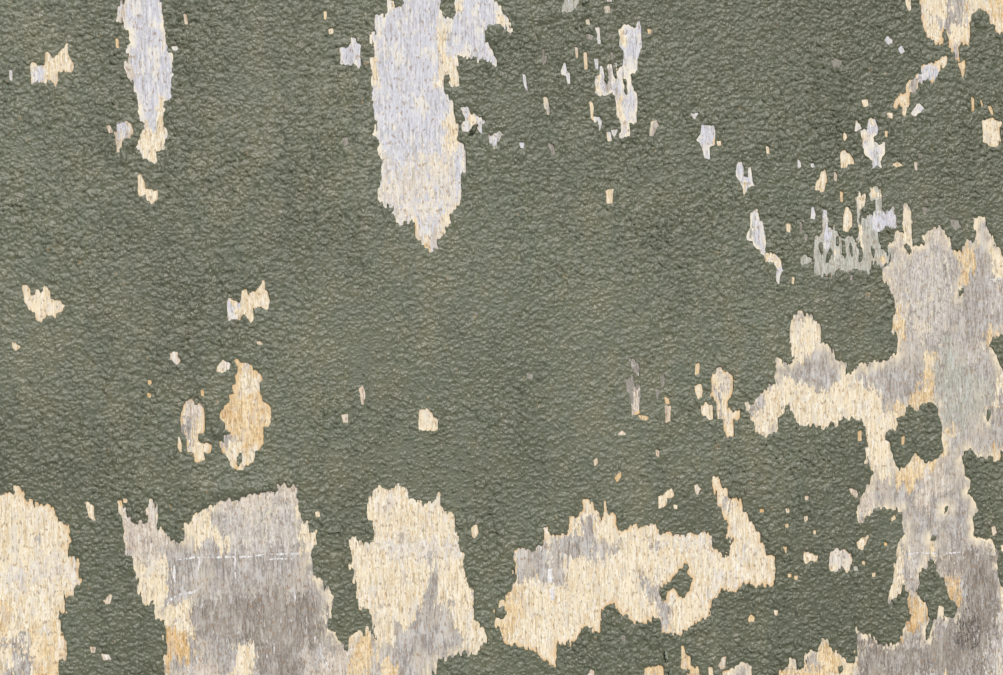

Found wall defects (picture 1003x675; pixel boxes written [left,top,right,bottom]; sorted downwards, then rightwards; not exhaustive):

peeling [115,0,174,164]
peeling [340,0,513,253]
peeling [589,21,642,139]
peeling [893,0,1003,116]
peeling [22,284,65,323]
peeling [226,279,270,322]
peeling [180,358,271,471]
peeling [418,408,438,431]
peeling [625,357,641,416]
peeling [695,186,1003,675]
peeling [0,485,82,675]
peeling [117,475,776,675]